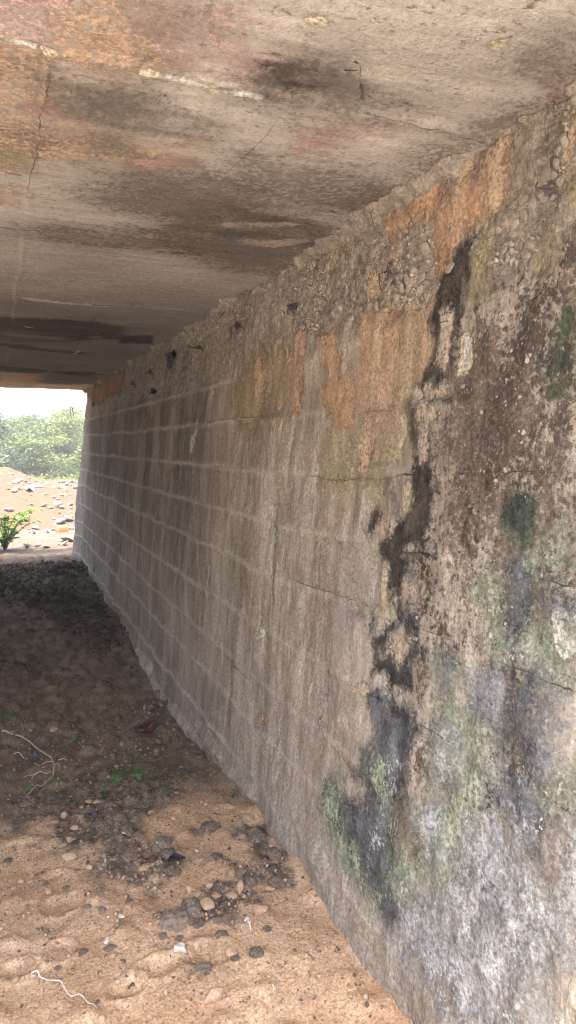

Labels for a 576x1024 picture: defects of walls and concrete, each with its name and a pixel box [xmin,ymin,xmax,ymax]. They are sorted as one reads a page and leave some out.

crack [12,63,51,193]
damp [0,0,576,276]
spalling [471,94,576,269]
crack [305,470,562,484]
damp [317,228,576,901]